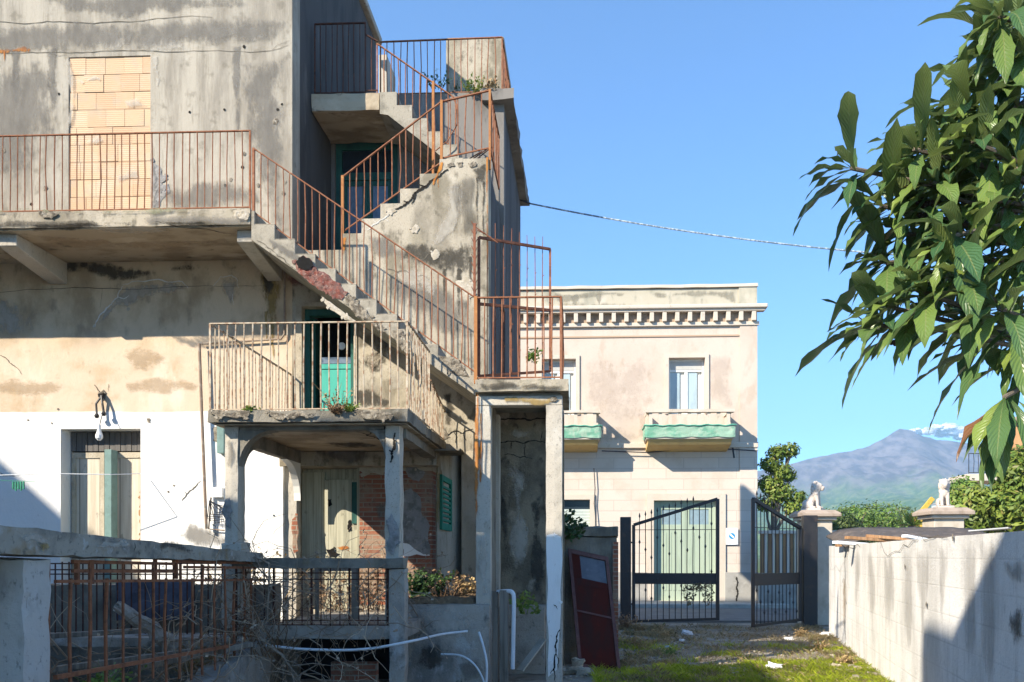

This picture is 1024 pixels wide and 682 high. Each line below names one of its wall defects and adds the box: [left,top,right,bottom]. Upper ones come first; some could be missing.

leakage [0,0,282,181]
spalling [150,158,170,208]
leakage [67,262,149,280]
spalling [292,255,413,354]
crack [359,432,397,463]
crack [501,417,545,459]
flaking render [378,488,431,556]
leakage [500,472,545,590]
crack [550,605,560,680]